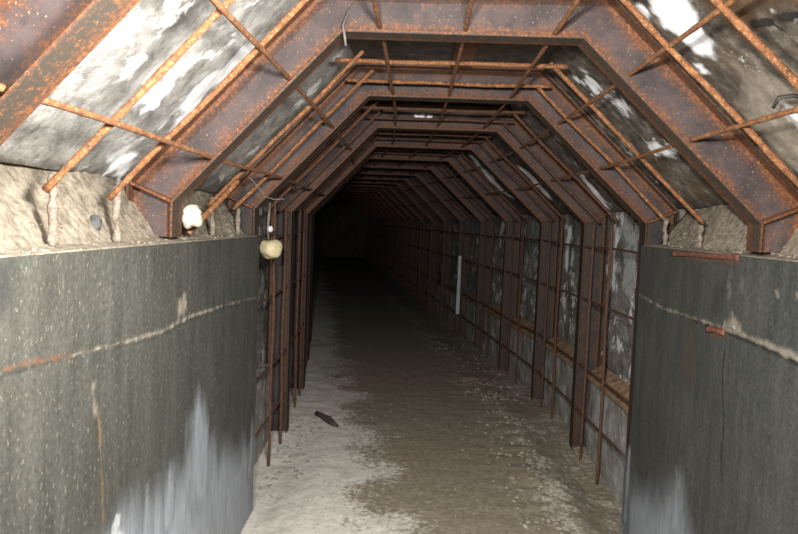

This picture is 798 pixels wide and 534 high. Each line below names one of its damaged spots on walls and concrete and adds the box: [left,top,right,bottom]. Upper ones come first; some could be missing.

damp [706,0,771,28]
damp [742,70,798,166]
crack [73,297,256,356]
crack [639,294,798,457]
efflorescence [111,399,254,534]
efflorescence [624,448,686,534]